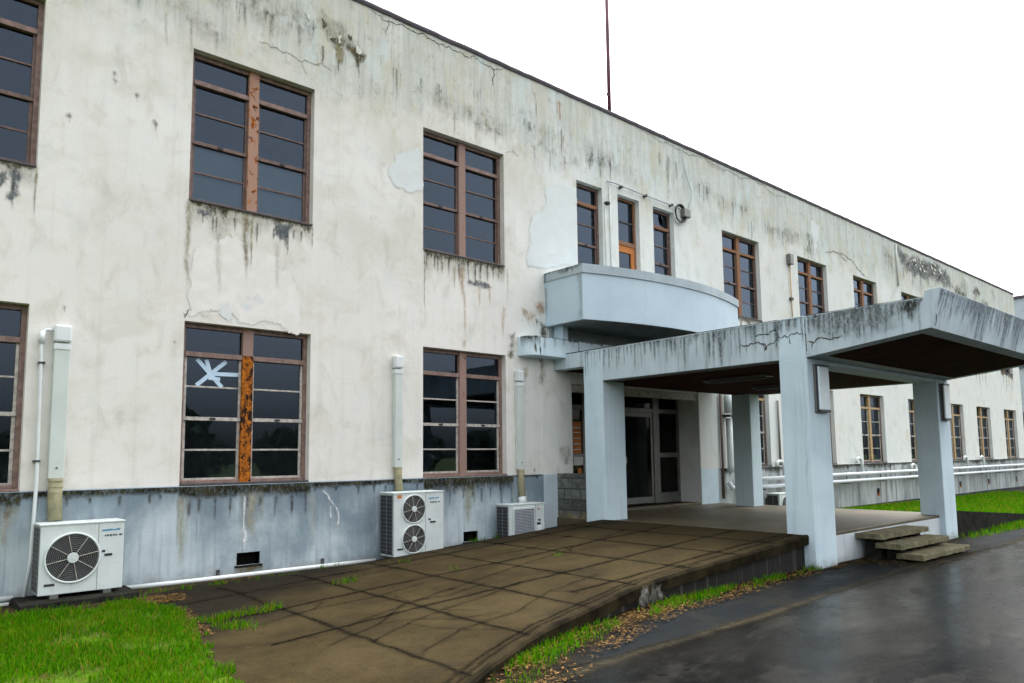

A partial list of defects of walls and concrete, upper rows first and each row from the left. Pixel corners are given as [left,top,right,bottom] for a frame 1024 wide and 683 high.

crack [261,42,329,73]
spalling [305,12,365,67]
damp [0,160,37,205]
damp [187,201,313,261]
crack [826,250,865,276]
damp [738,303,892,340]
crack [740,316,839,501]
crack [337,530,623,642]